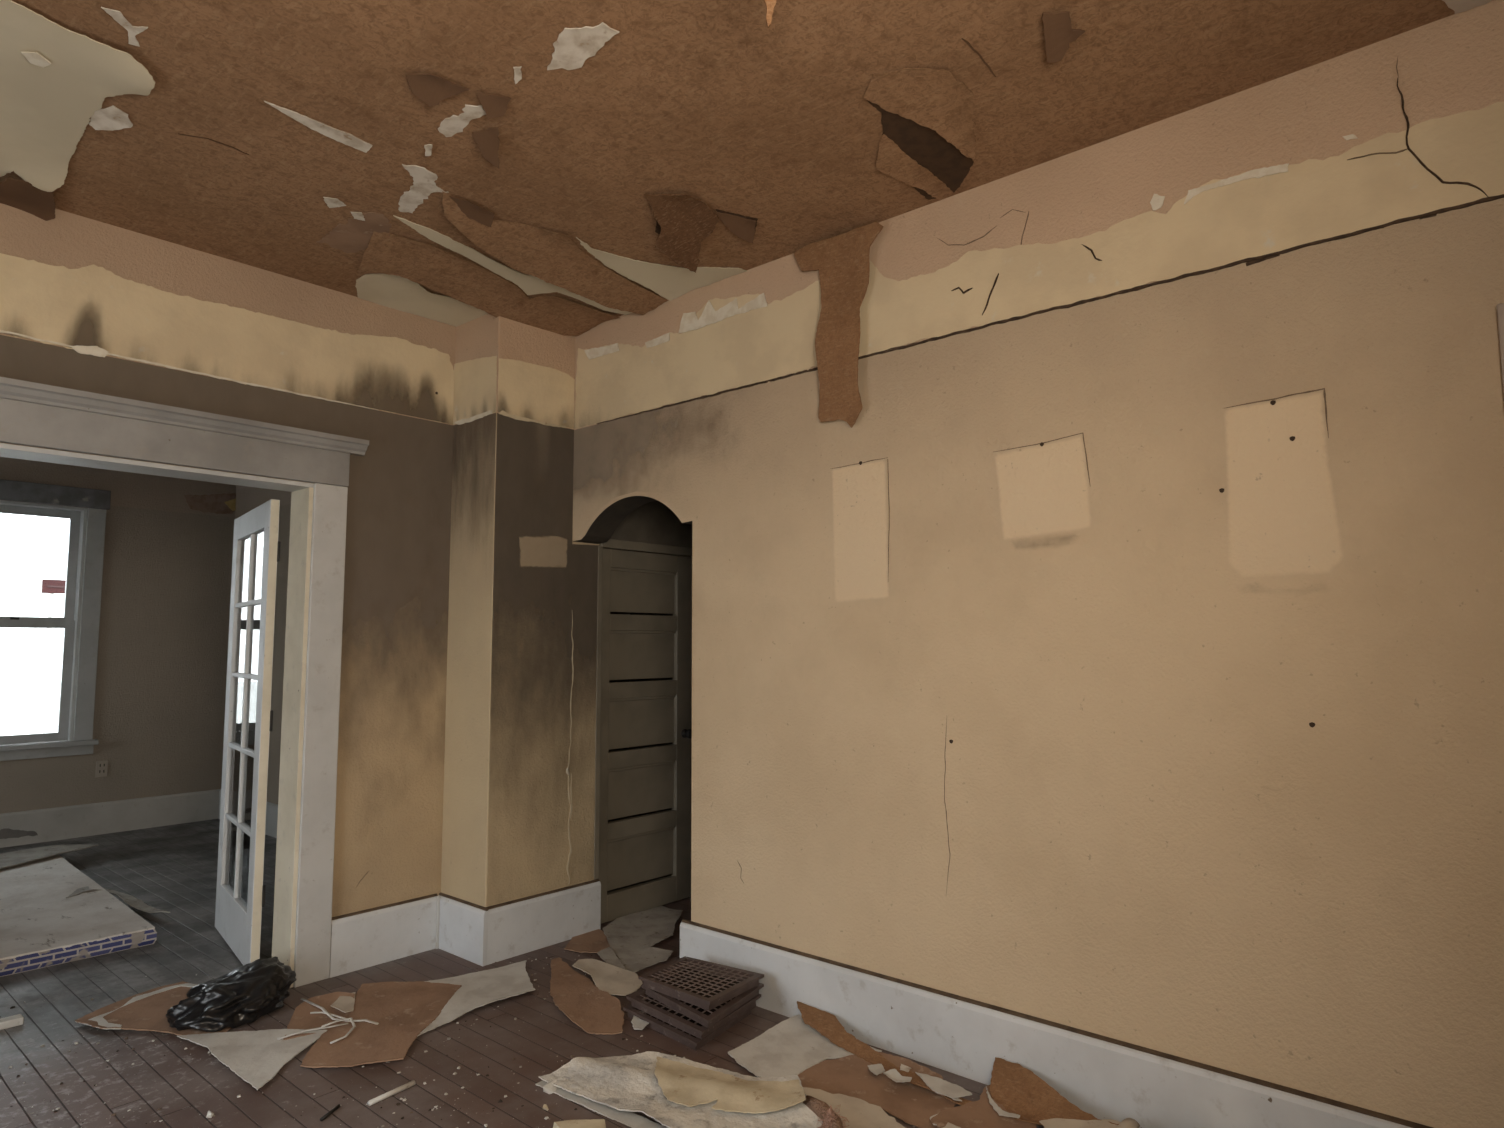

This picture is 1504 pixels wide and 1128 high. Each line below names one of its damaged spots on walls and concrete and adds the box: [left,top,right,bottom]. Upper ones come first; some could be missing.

flaking render [101,7,148,47]
flaking render [513,66,522,84]
flaking render [547,22,619,70]
crack [962,38,996,77]
flaking render [89,105,133,131]
flaking render [264,101,372,153]
flaking render [323,197,365,221]
flaking render [393,104,632,315]
crack [858,57,1504,359]
peeling [859,102,1504,357]
peeling [0,237,821,429]
crack [597,367,818,424]